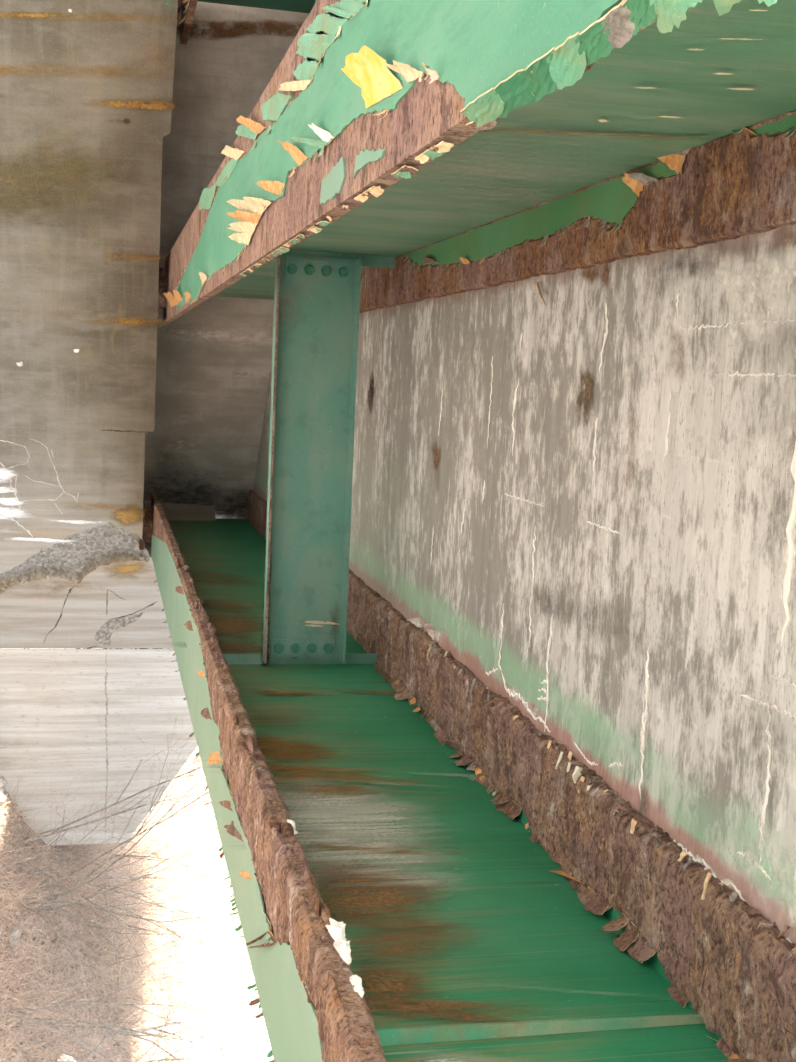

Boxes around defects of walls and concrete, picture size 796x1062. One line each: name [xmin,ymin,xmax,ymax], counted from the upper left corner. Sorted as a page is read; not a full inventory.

peeling [341,45,440,119]
peeling [460,0,777,131]
peeling [163,116,334,308]
crack [781,435,796,647]
crack [485,526,554,732]
damp [325,918,364,998]
damp [283,787,440,888]
rust [260,798,502,1021]
damp [574,742,622,768]
rust [560,866,656,963]
rust [513,711,738,902]
crack [639,646,650,799]